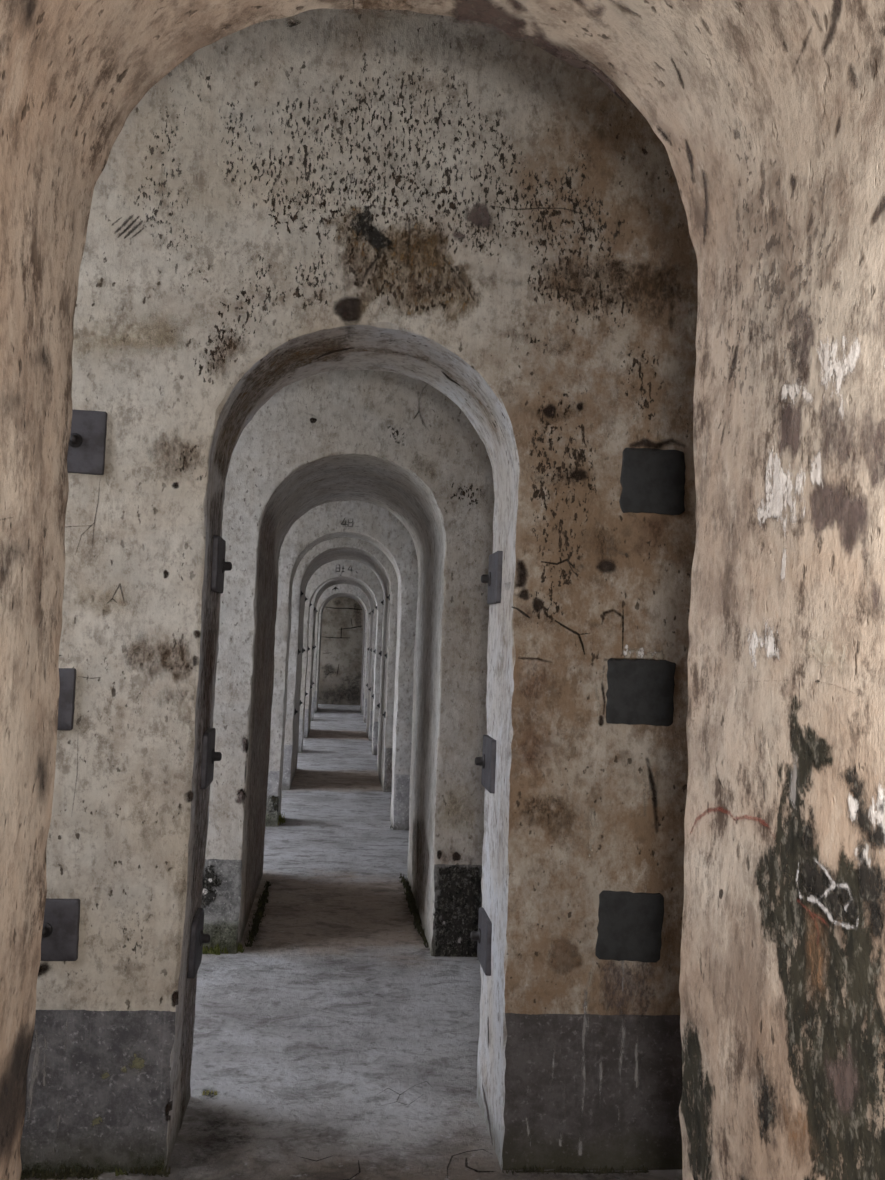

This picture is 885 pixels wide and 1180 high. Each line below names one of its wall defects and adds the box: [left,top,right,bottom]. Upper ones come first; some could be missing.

water stain [124,109,192,250]
water stain [193,54,676,382]
water stain [623,347,662,432]
water stain [755,675,885,1180]